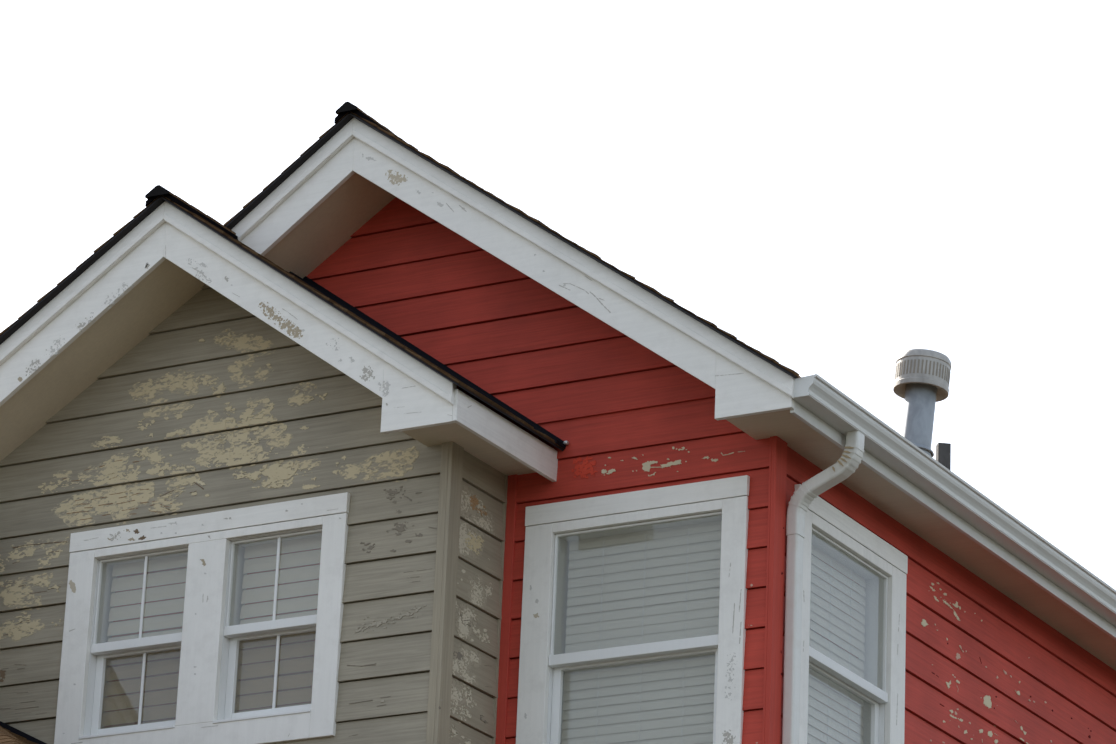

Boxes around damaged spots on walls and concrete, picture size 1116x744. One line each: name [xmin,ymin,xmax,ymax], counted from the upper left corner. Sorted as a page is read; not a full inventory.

peeling [333,446,419,482]
peeling [601,447,745,476]
peeling [0,329,328,641]
peeling [449,484,495,744]
peeling [929,582,982,621]
peeling [943,708,998,744]